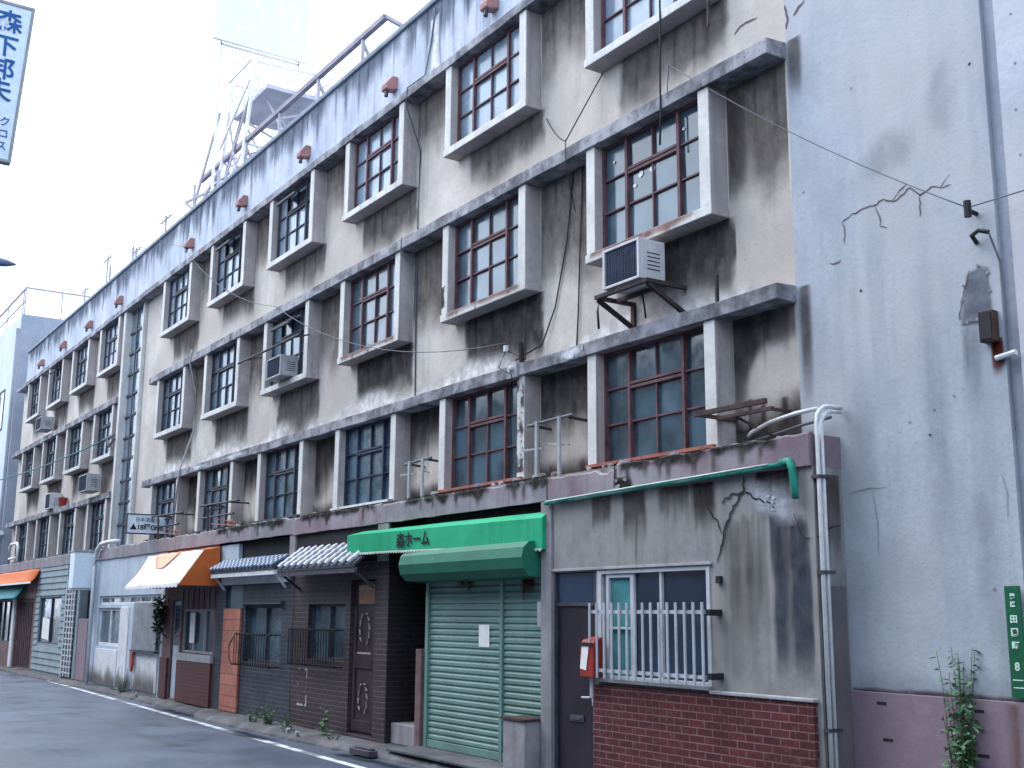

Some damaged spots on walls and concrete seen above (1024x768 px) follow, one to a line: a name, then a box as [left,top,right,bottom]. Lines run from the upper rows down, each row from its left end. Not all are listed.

crack [784,0,805,29]
damp [726,36,799,193]
damp [31,0,454,359]
damp [541,164,587,265]
crack [830,176,951,265]
spalling [959,264,991,325]
damp [161,292,543,514]
damp [541,363,588,425]
damp [301,504,373,524]
crack [700,476,841,563]
damp [770,514,814,656]